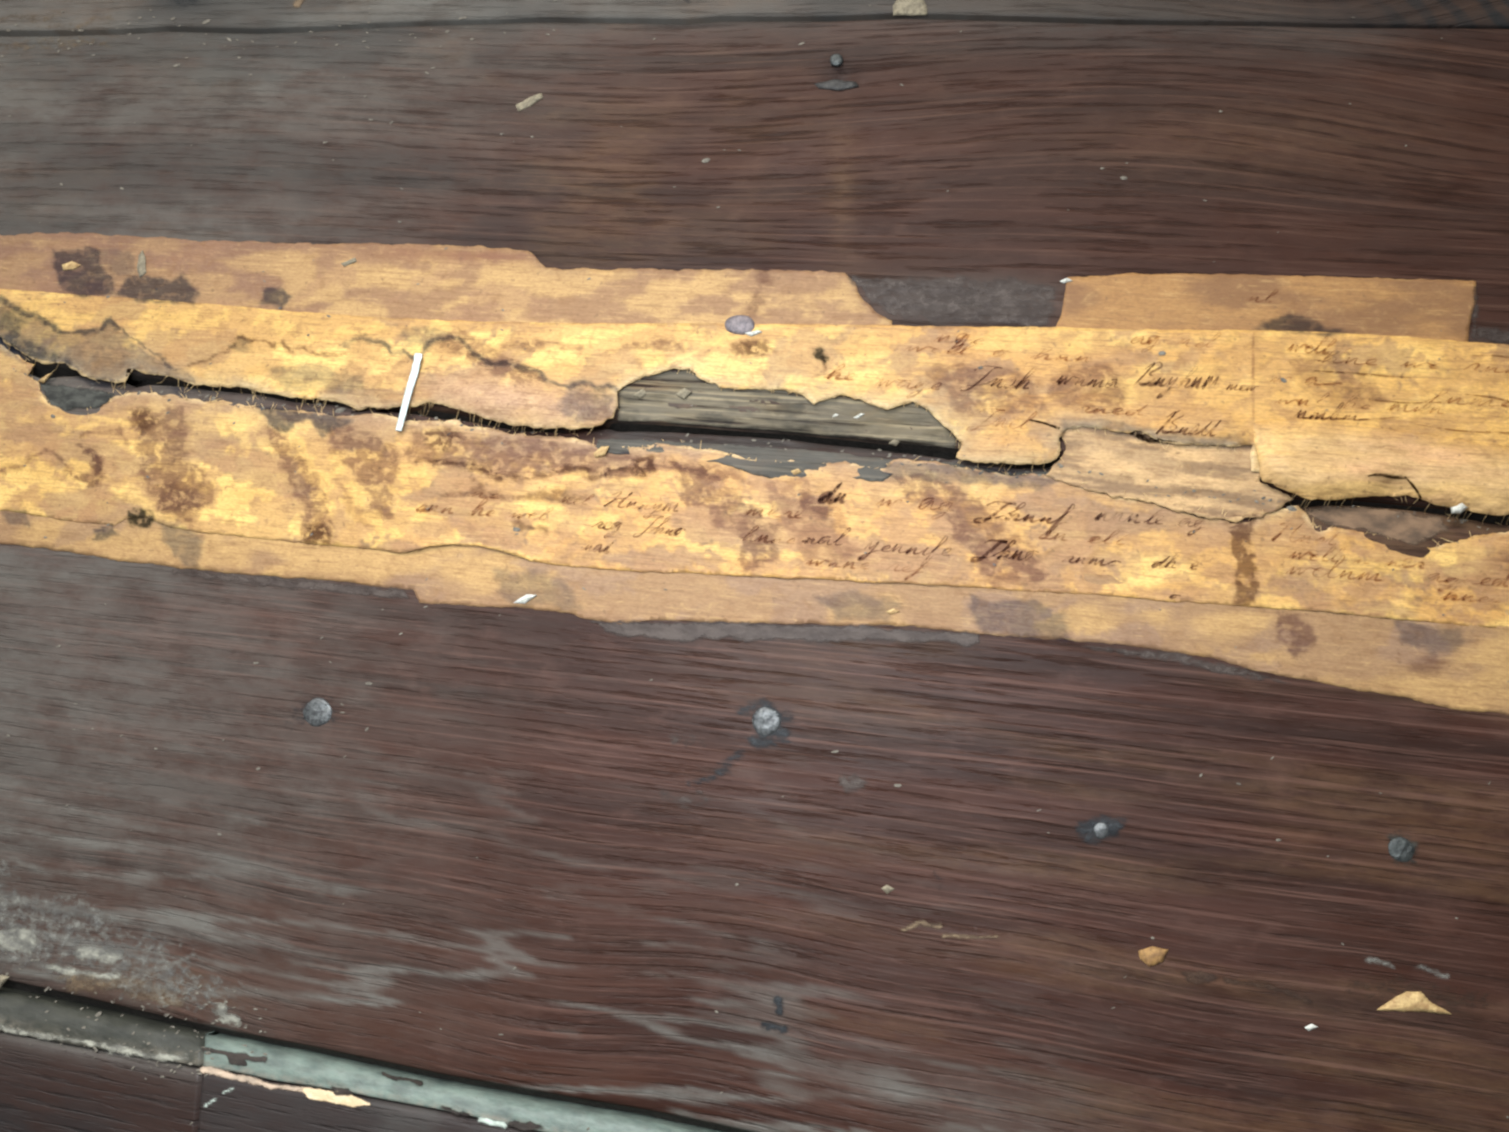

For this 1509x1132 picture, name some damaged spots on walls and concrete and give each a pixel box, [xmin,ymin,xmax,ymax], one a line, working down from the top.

crack [23,359,88,379]
crack [125,368,567,434]
crack [605,419,1060,469]
crack [1130,433,1174,443]
crack [1284,494,1509,525]